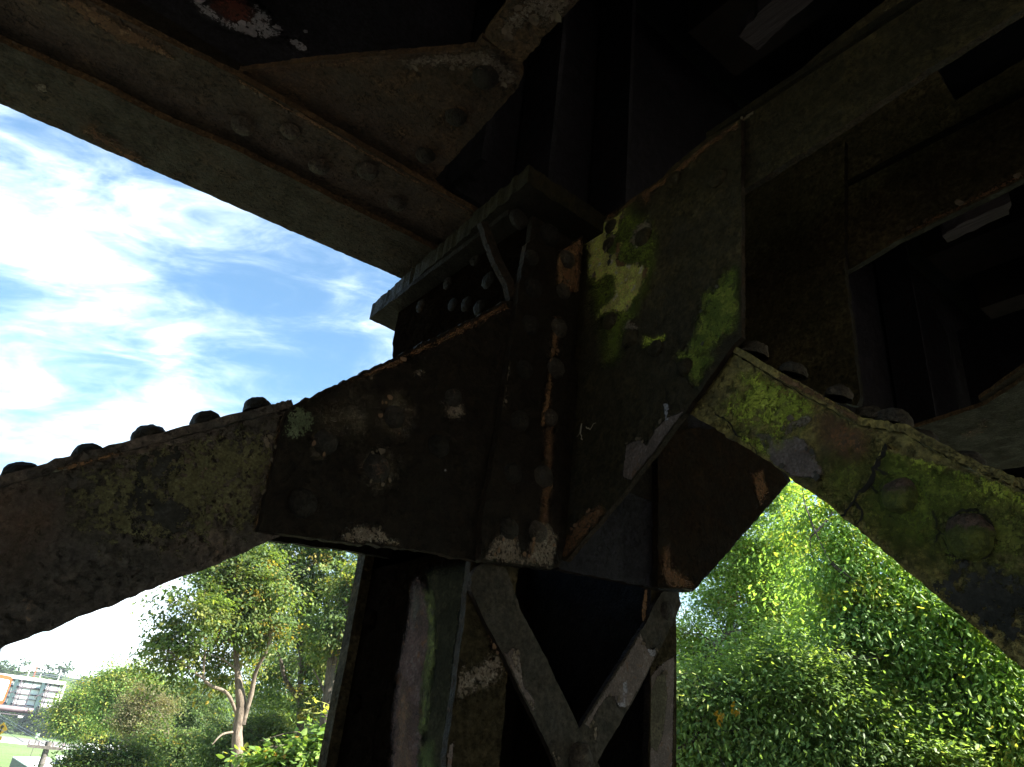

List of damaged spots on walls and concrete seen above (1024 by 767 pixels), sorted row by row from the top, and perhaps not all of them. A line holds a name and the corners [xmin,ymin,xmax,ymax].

peeling [194,0,308,51]
rust [558,238,582,291]
rust [540,332,560,468]
peeling [623,403,683,480]
crack [840,444,891,524]
rust [485,486,605,569]